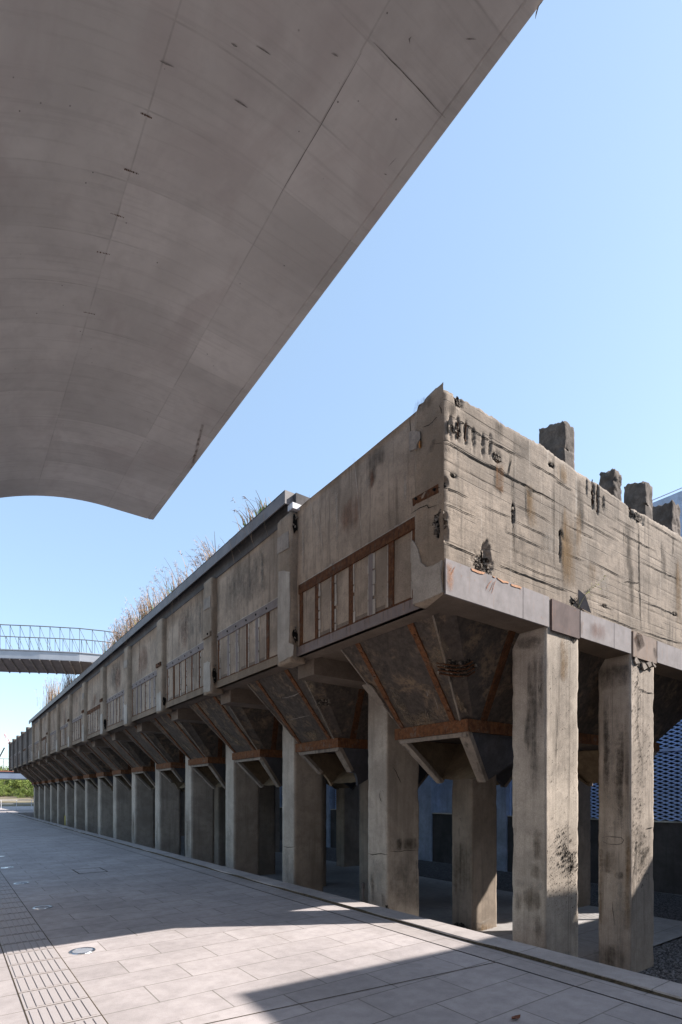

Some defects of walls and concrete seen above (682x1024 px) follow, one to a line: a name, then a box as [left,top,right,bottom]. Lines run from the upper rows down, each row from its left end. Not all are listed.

spalling [447,420,502,462]
spalling [432,509,448,539]
crack [410,406,681,643]
spalling [471,550,522,589]